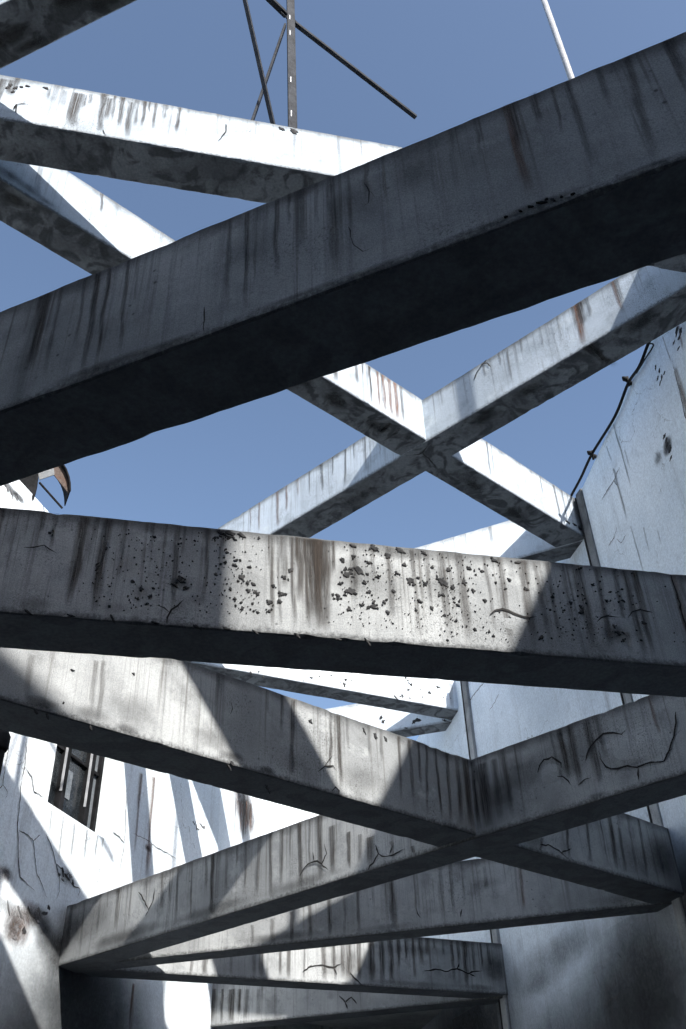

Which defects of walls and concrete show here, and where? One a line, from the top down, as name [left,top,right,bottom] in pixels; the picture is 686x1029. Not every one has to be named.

damp [68,92,86,121]
damp [99,93,157,129]
spalling [504,192,575,219]
corrosion [573,301,584,337]
spalling [324,544,647,647]
crack [490,605,537,618]
crack [538,712,677,785]
crack [0,739,80,899]
crack [300,845,328,875]
crack [368,846,403,869]
damp [9,916,26,940]
crack [303,963,362,1008]